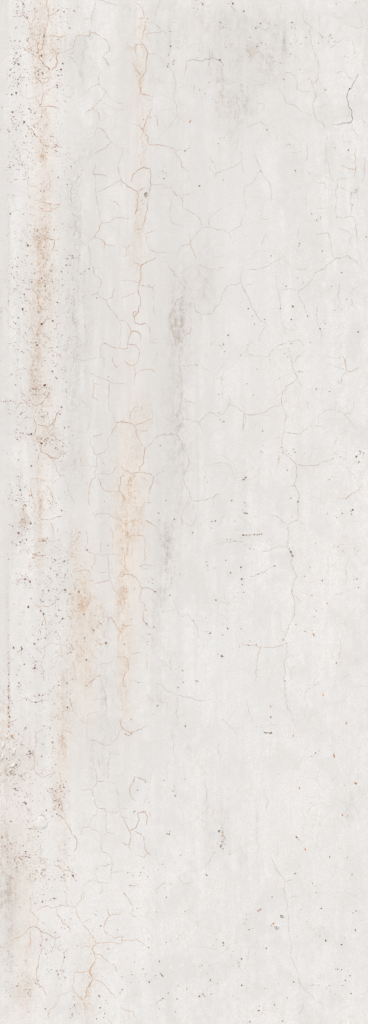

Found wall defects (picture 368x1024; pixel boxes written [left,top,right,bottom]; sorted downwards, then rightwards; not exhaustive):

crack [14,878,141,1017]